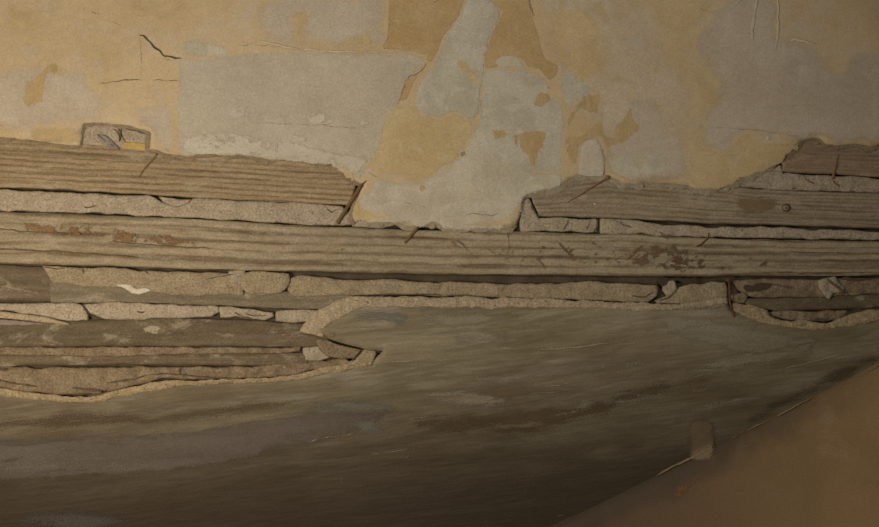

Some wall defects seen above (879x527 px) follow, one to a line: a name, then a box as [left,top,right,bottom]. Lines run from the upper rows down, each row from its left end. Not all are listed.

crack [140,35,181,59]
peeling [383,0,558,118]
peeling [493,130,546,168]
peeling [524,92,879,200]
flaking render [0,122,386,225]
corrosion [500,241,732,274]
flaking render [0,311,70,325]
flaking render [300,296,879,337]
flaking render [0,358,374,403]